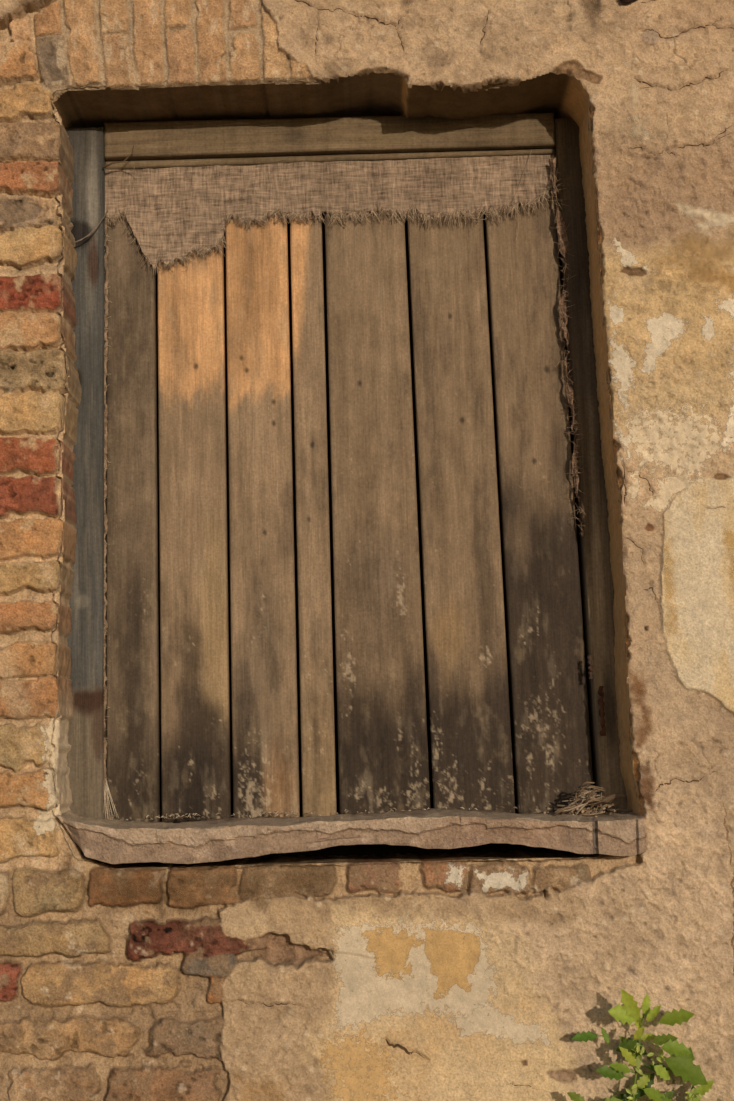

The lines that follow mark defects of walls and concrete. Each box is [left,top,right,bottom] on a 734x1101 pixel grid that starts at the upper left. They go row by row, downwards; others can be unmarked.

crack [295,0,406,53]
crack [647,18,734,39]
crack [634,70,729,90]
crack [628,125,732,155]
peeling [612,237,649,272]
peeling [607,297,734,518]
peeling [244,914,551,1101]
spalling [546,1070,580,1085]